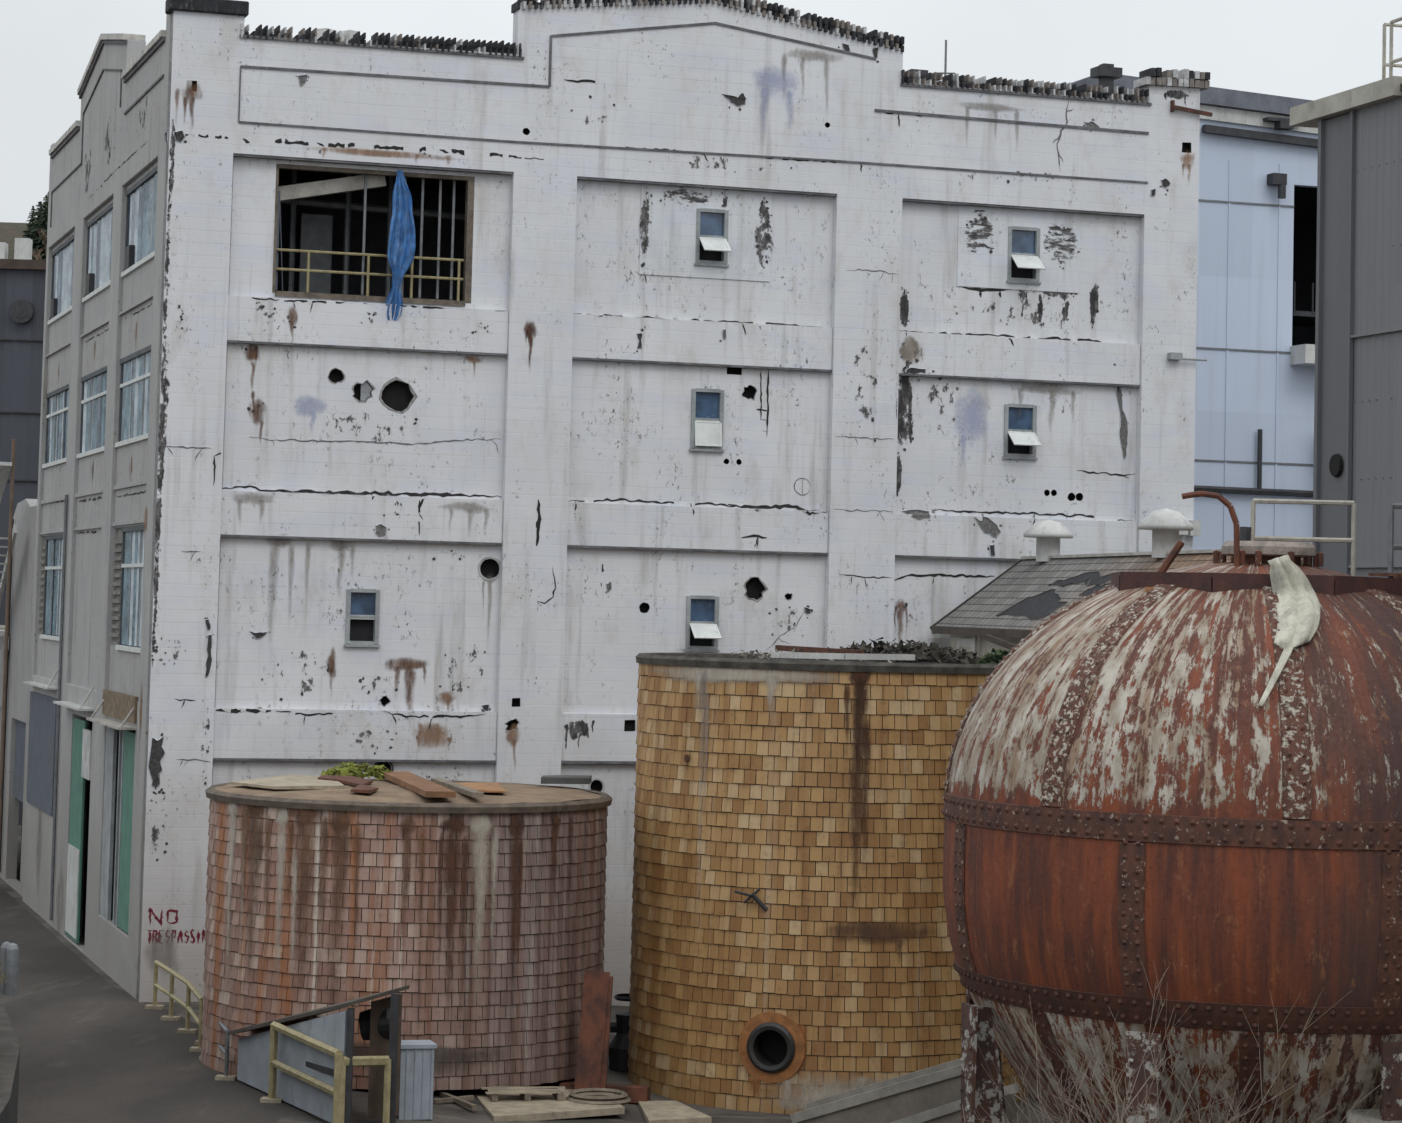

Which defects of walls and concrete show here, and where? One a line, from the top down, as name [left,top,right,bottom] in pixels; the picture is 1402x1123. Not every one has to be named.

peeling [755,197,774,268]
peeling [959,210,994,253]
spalling [327,368,430,445]
crack [163,445,500,535]
crack [536,478,893,604]
crack [931,509,1131,525]
crack [839,573,995,588]
corrosion [389,659,426,702]
corrosion [419,725,452,745]
efflorescence [276,808,298,951]
efflorescence [471,817,498,953]
damp [434,1048,484,1072]